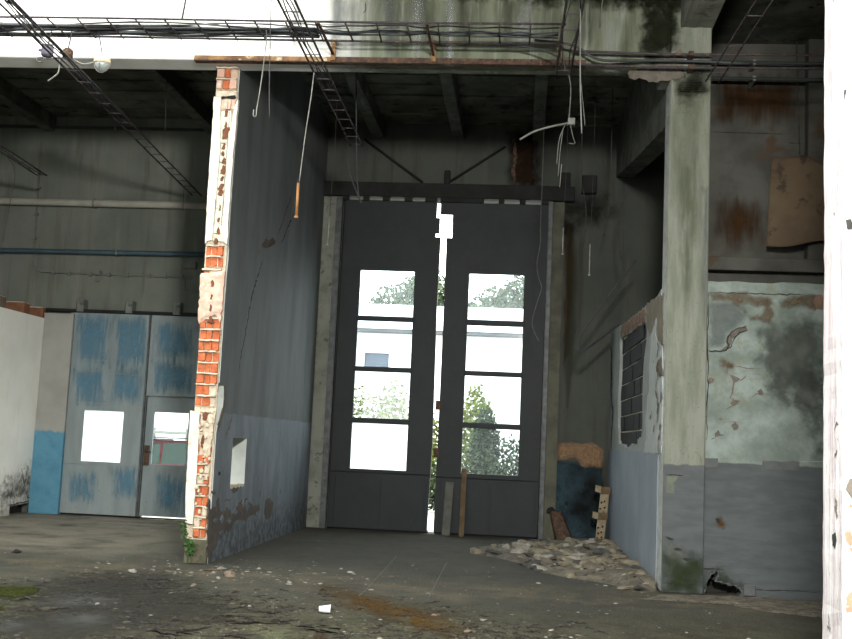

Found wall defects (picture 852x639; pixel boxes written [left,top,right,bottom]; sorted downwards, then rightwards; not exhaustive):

water stain [586,0,681,59]
flaking render [812,295,824,311]
flaking render [155,244,273,558]
peeling [620,293,664,455]
peeling [832,529,852,554]